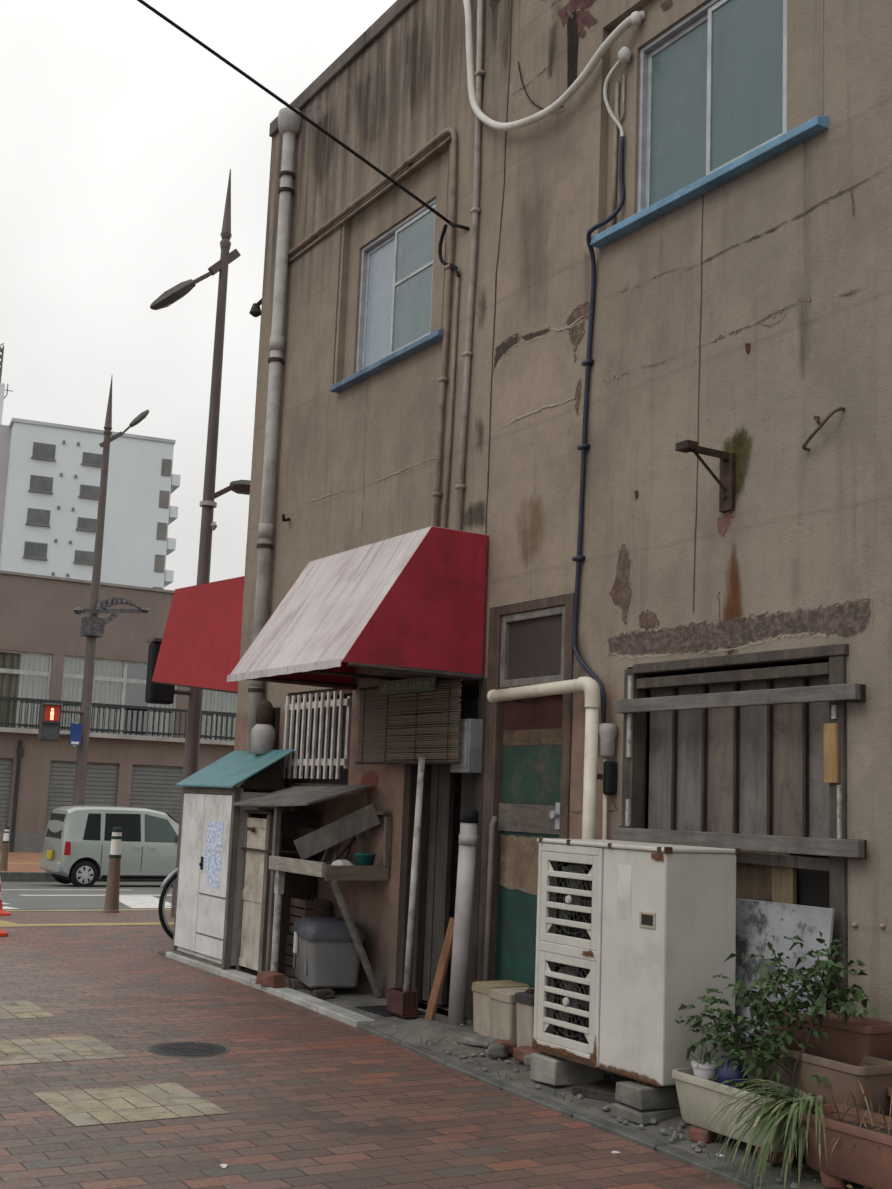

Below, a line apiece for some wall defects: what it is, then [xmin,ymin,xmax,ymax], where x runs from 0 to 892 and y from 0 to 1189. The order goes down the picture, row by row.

peeling [553,0,598,38]
crack [552,165,891,331]
peeling [493,327,550,372]
peeling [565,302,590,362]
crack [604,288,860,381]
peeling [575,377,584,415]
corrosion [725,560,741,622]
spalling [607,541,874,660]